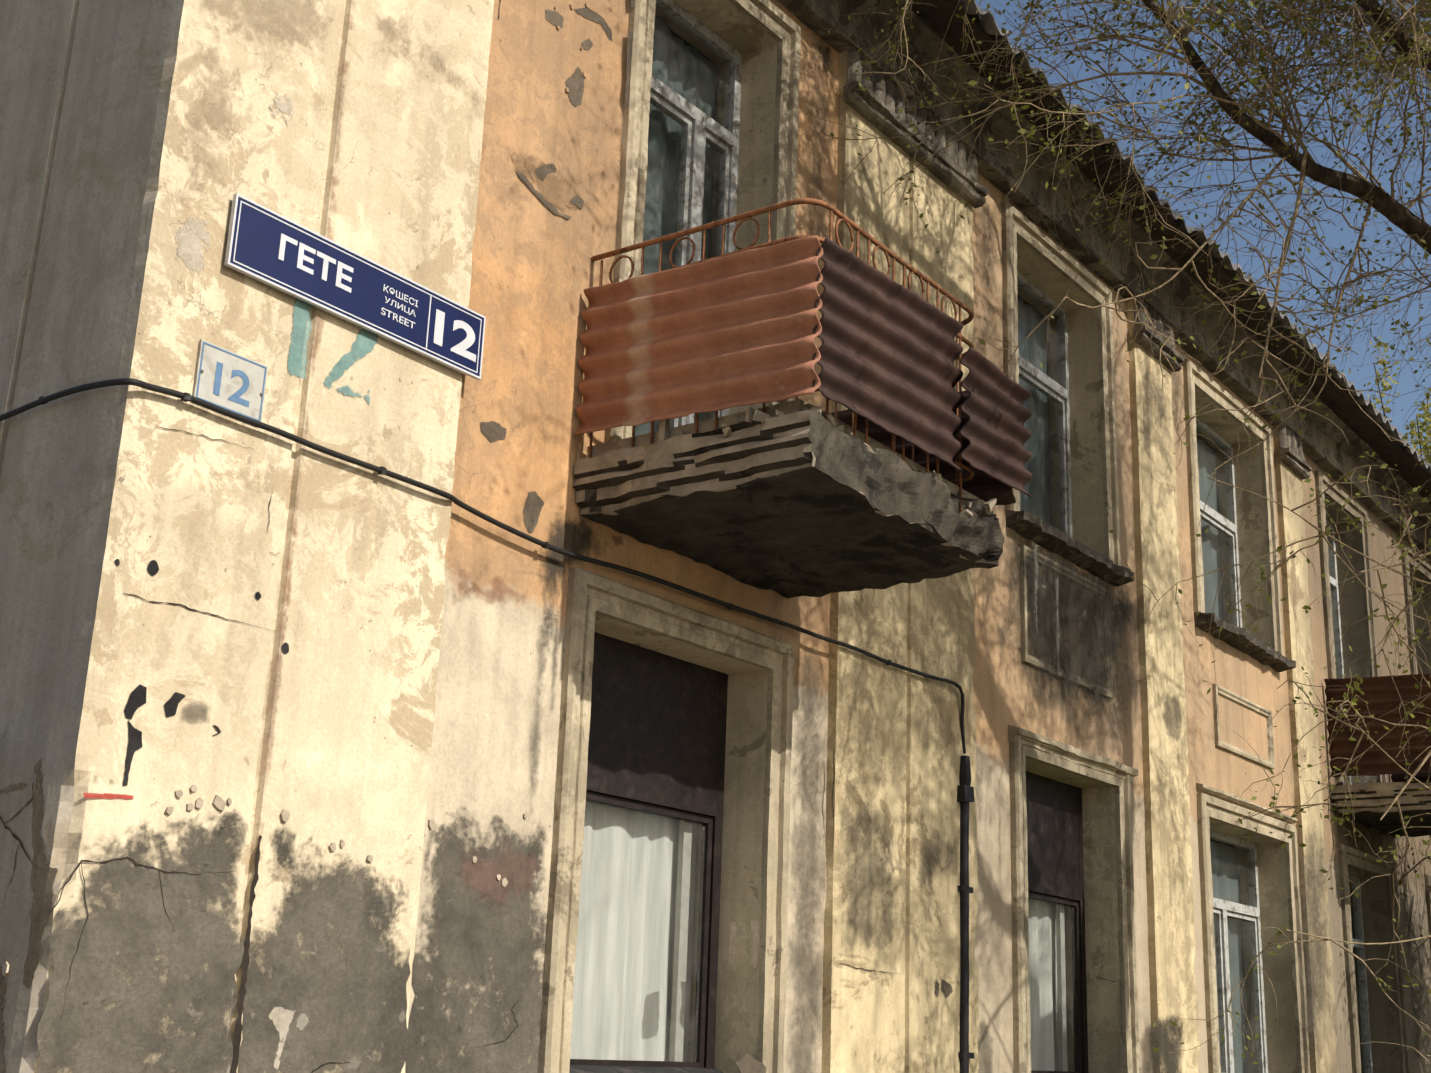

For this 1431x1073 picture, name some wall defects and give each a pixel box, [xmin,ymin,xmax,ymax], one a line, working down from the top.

spalling [545,2,633,107]
leakage [1013,542,1140,723]
crack [0,771,262,1073]
spalling [0,759,547,1073]
leakage [462,853,539,903]
leakage [850,818,891,943]
leakage [923,842,953,869]
spalling [736,1053,766,1073]
leakage [795,925,816,1073]
leakage [1147,1016,1183,1073]